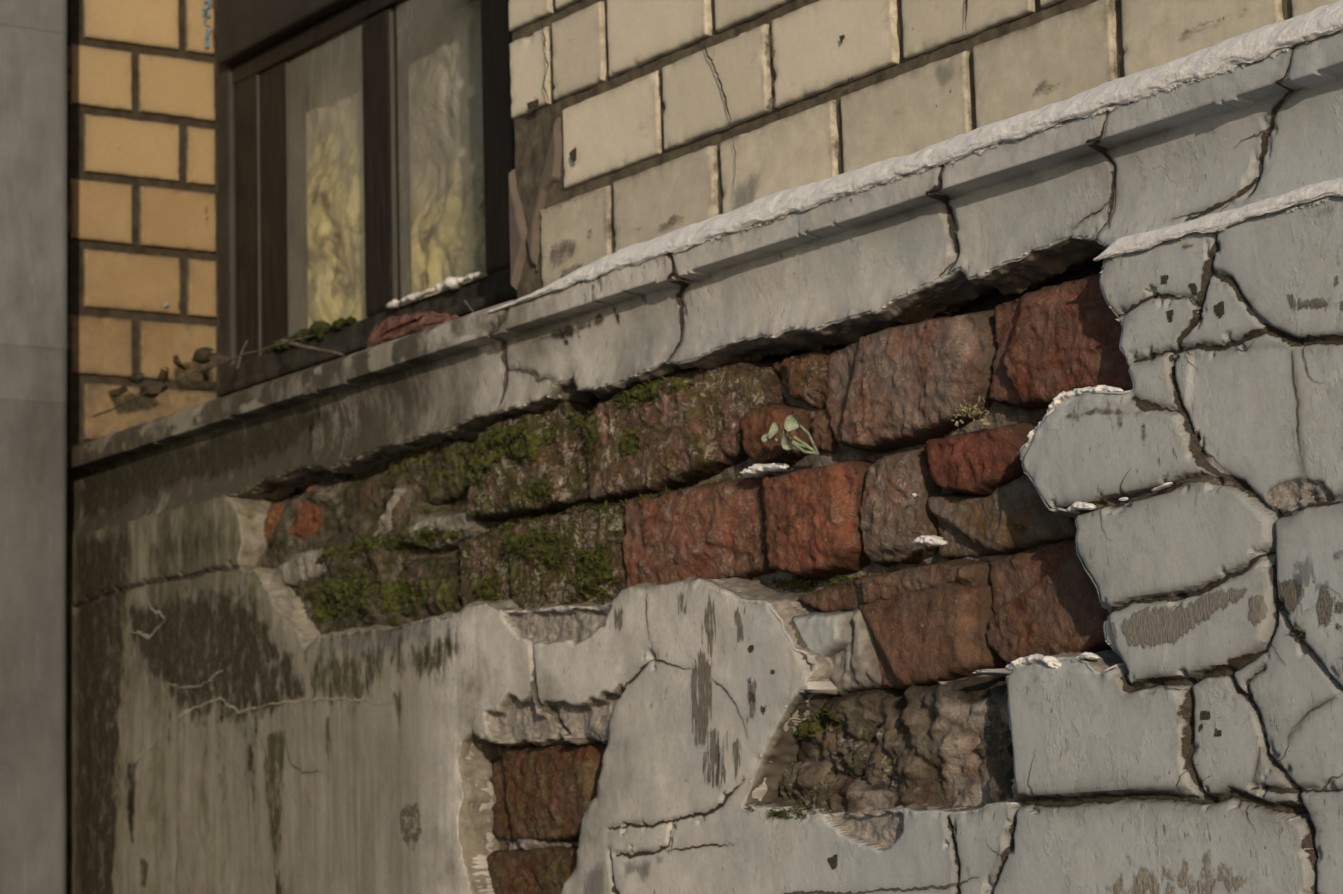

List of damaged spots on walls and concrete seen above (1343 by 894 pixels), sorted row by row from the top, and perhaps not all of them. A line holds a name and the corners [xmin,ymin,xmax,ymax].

crack [489,299,553,403]
crack [664,253,688,363]
crack [784,47,1343,894]
spalling [226,237,1343,850]
crack [77,567,238,639]
crack [134,670,393,763]
water stain [76,536,459,894]
spalling [458,690,625,894]
crack [609,780,744,894]